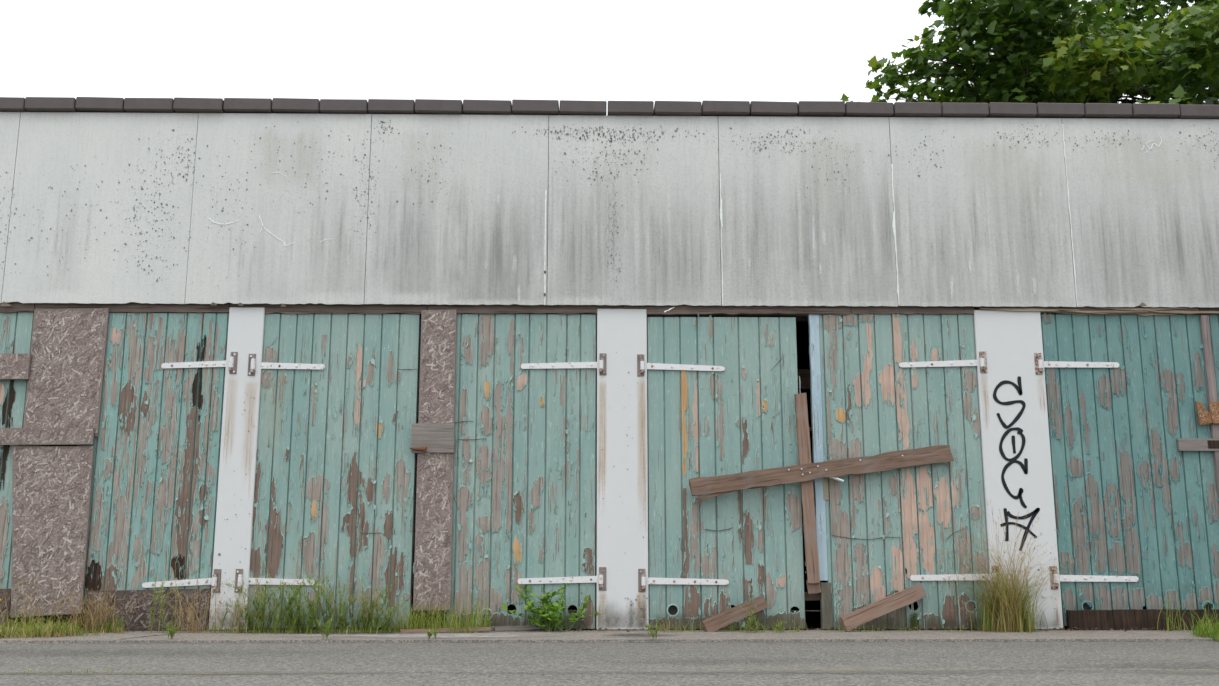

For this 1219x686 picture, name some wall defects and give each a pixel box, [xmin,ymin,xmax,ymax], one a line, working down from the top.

peeling [87,302,225,591]
peeling [250,335,414,626]
peeling [450,314,595,629]
peeling [650,314,806,629]
peeling [1046,321,1219,613]